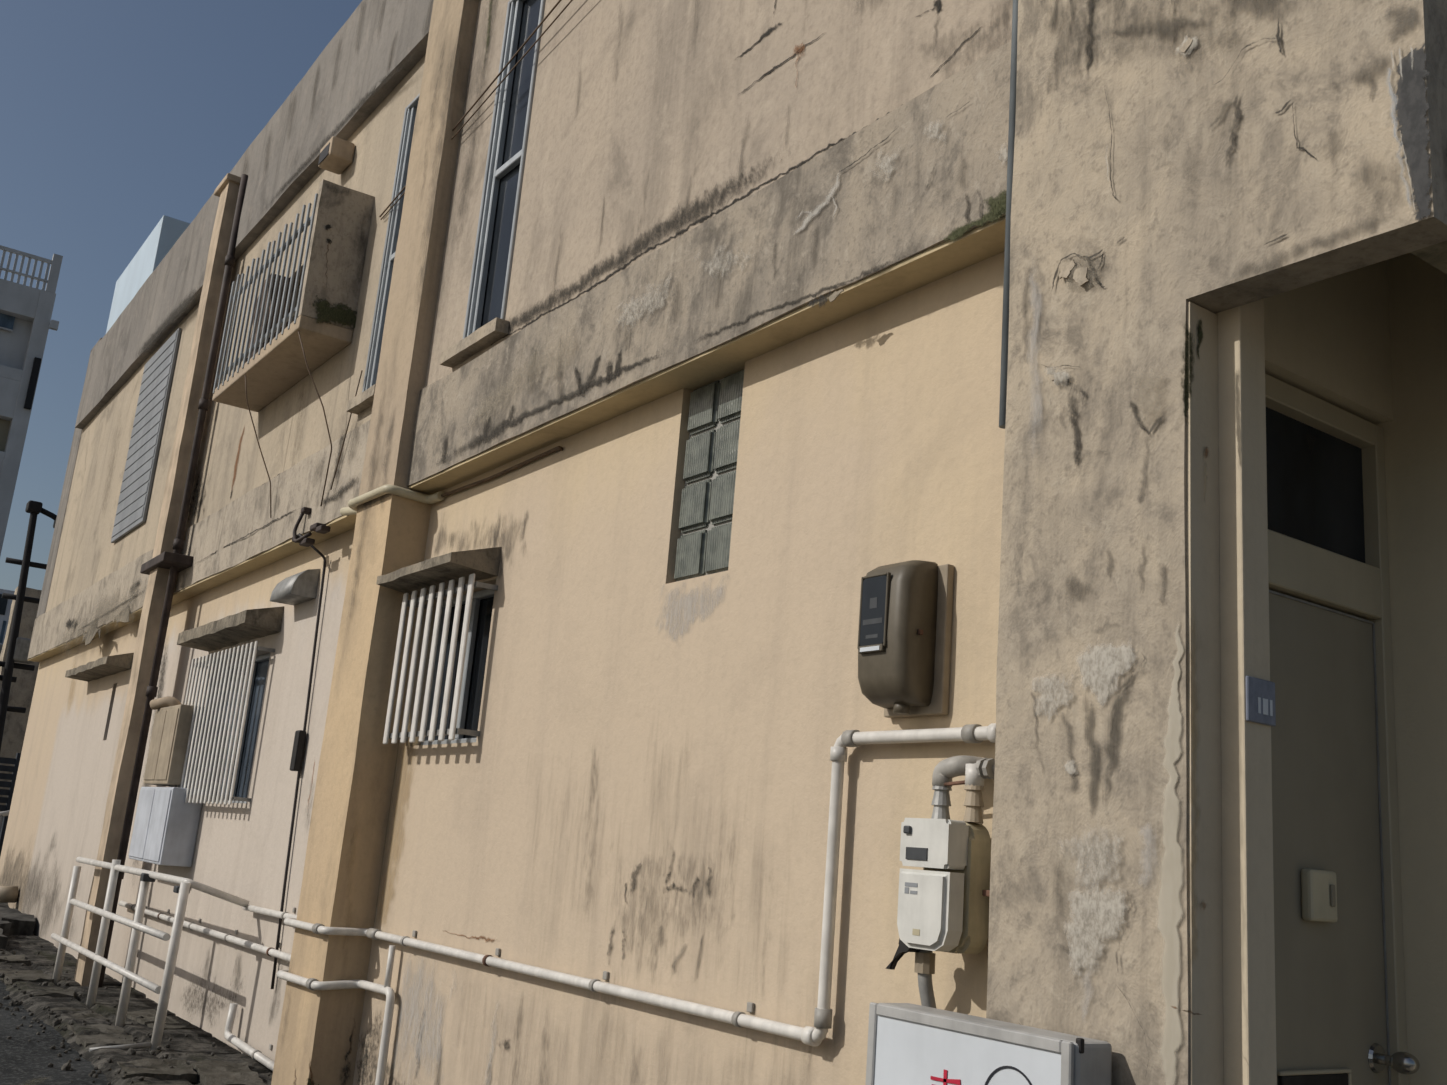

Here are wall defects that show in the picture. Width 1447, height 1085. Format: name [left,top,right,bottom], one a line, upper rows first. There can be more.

crack [738,1,819,94]
crack [931,28,980,76]
crack [1275,101,1315,158]
peeling [1389,43,1432,220]
crack [491,105,902,345]
leakage [439,350,657,463]
peeling [1066,833,1133,972]